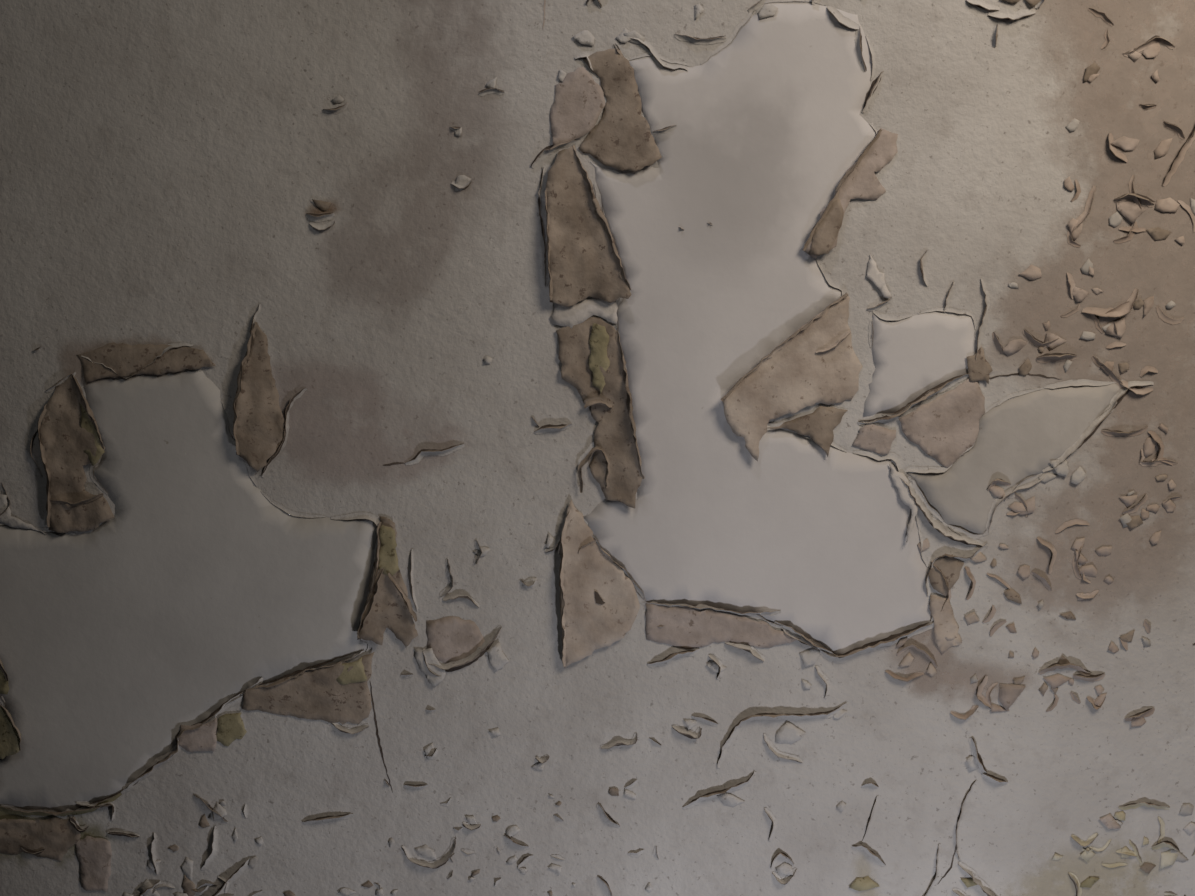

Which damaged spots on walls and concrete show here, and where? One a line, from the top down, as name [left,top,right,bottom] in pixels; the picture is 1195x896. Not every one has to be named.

peeling [544,0,1184,768]
peeling [0,304,509,896]
crack [302,814,354,825]
peeling [389,815,534,879]
peeling [597,780,638,828]
crack [836,782,879,844]
crack [938,737,1008,896]
peeling [597,876,612,896]